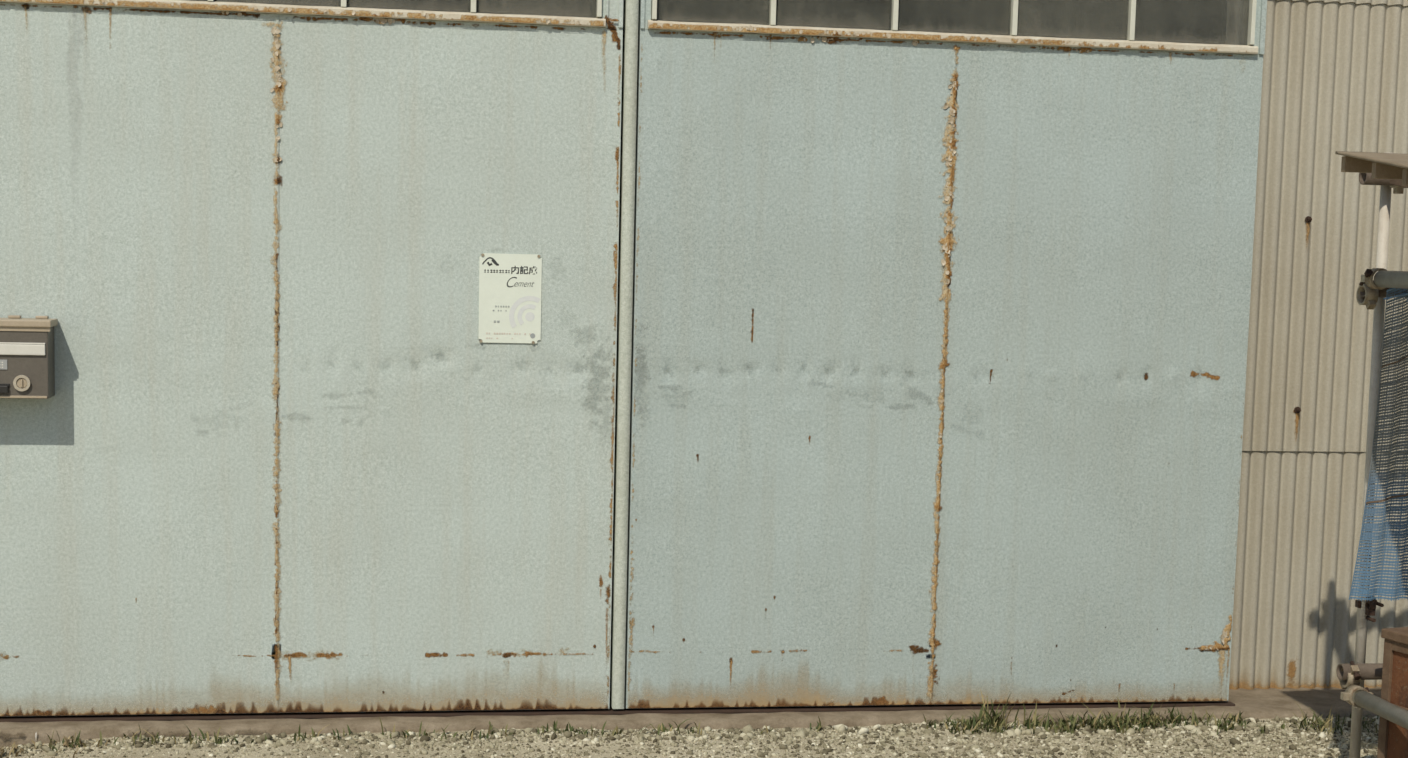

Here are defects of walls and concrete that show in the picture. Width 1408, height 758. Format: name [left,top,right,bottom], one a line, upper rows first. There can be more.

rust [0,0,621,79]
rust [649,23,1247,58]
rust [492,242,617,658]
rust [238,652,342,674]
rust [0,678,609,716]
rust [628,550,1341,708]